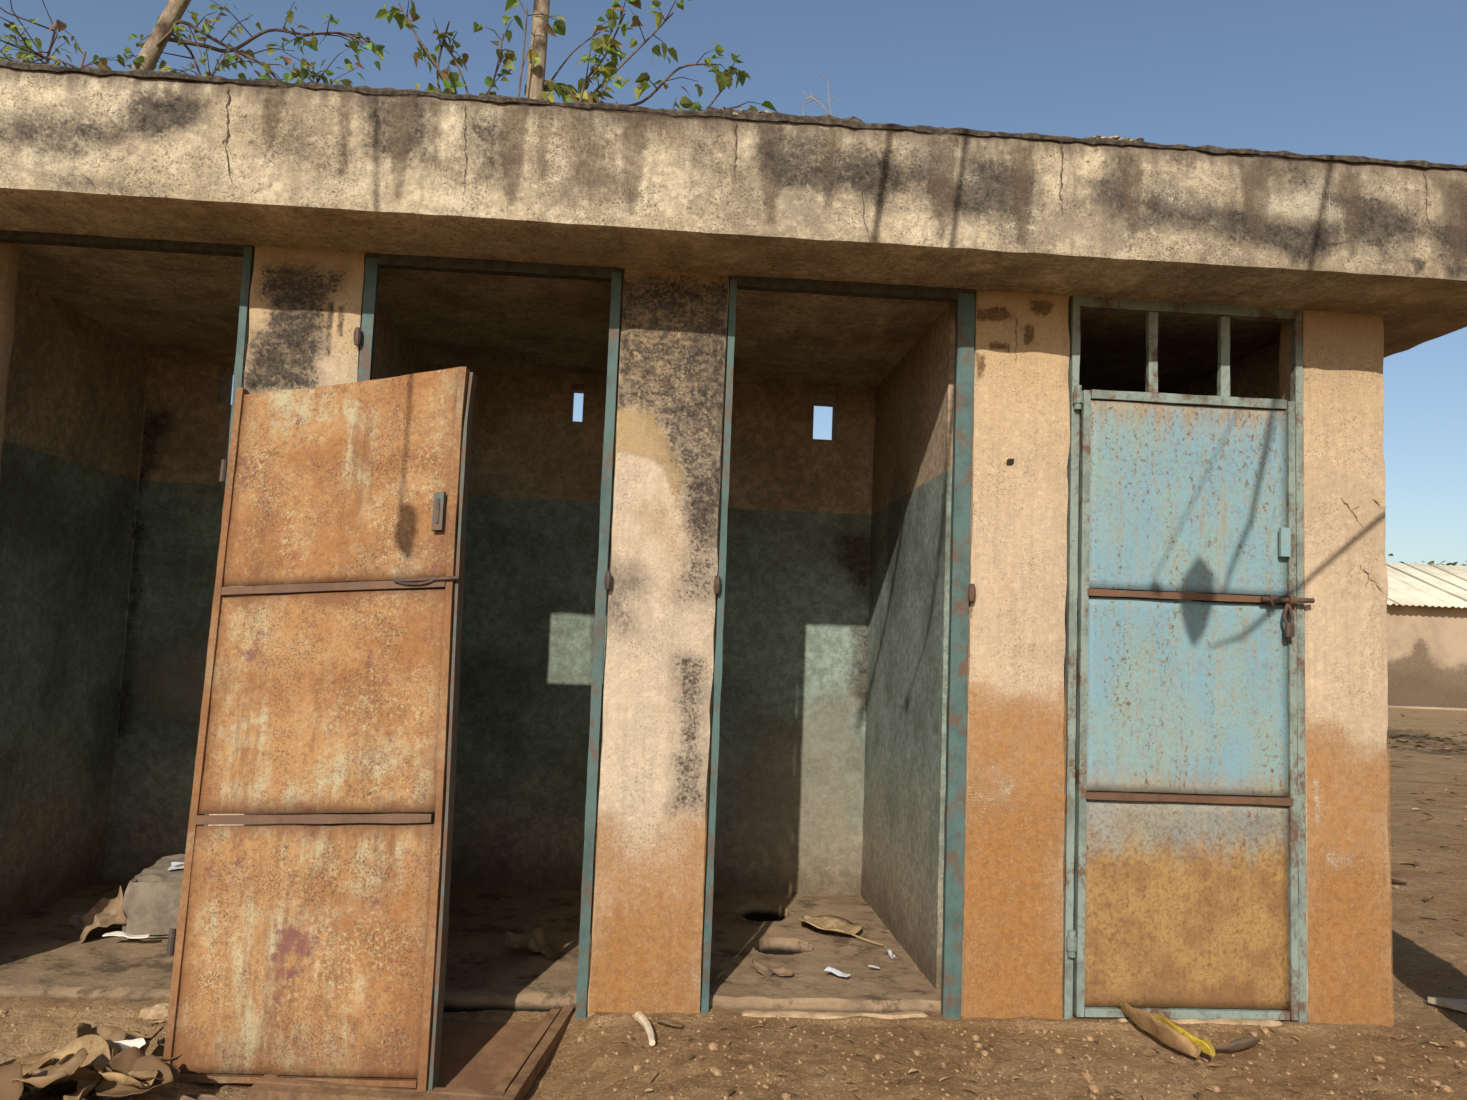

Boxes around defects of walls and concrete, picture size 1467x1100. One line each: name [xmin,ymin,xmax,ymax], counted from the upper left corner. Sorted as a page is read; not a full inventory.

damp [0,90,206,191]
damp [339,95,440,196]
damp [460,106,526,199]
damp [749,125,1040,240]
damp [1094,155,1467,276]
mould [242,265,345,393]
damp [617,274,728,601]
damp [663,656,710,811]